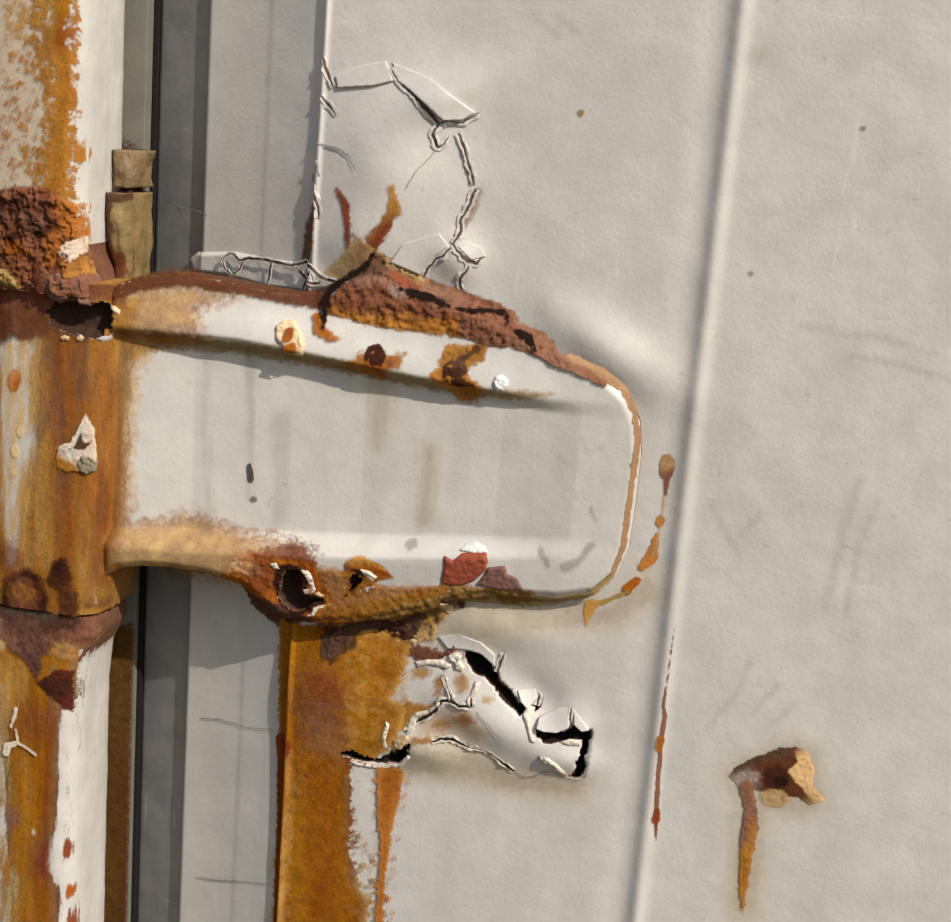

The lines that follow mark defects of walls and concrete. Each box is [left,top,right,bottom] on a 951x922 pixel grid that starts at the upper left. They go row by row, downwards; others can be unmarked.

crack [319,57,339,117]
crack [310,143,354,218]
crack [388,67,483,291]
crack [220,251,337,291]
spalling [46,300,114,339]
peeling [56,414,97,471]
rust [0,0,675,922]
spalling [342,702,440,762]
spalling [439,634,592,776]